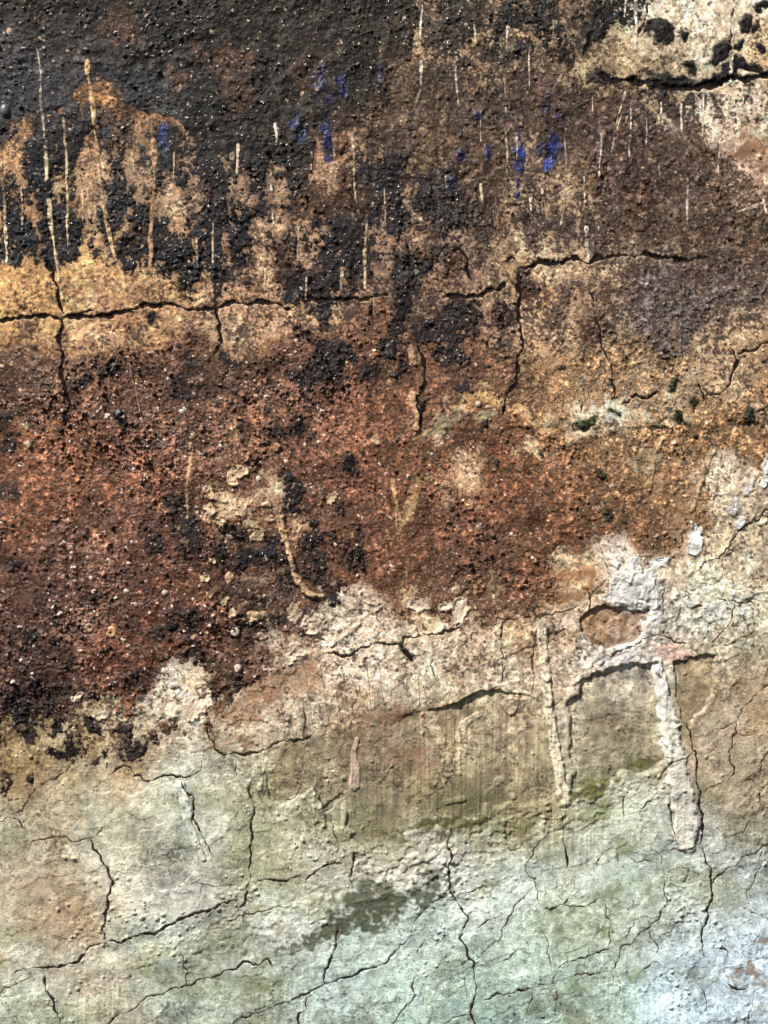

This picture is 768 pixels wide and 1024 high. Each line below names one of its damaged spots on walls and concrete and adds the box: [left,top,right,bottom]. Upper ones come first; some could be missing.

crack [582,30,768,92]
water stain [0,0,768,448]
crack [0,258,393,425]
crack [444,246,707,416]
water stain [0,405,65,504]
rust [0,296,768,735]
water stain [398,642,413,661]
water stain [601,510,634,528]
flaking render [580,557,670,647]
crack [0,708,356,1024]
water stain [274,859,461,955]
crack [233,665,768,1024]